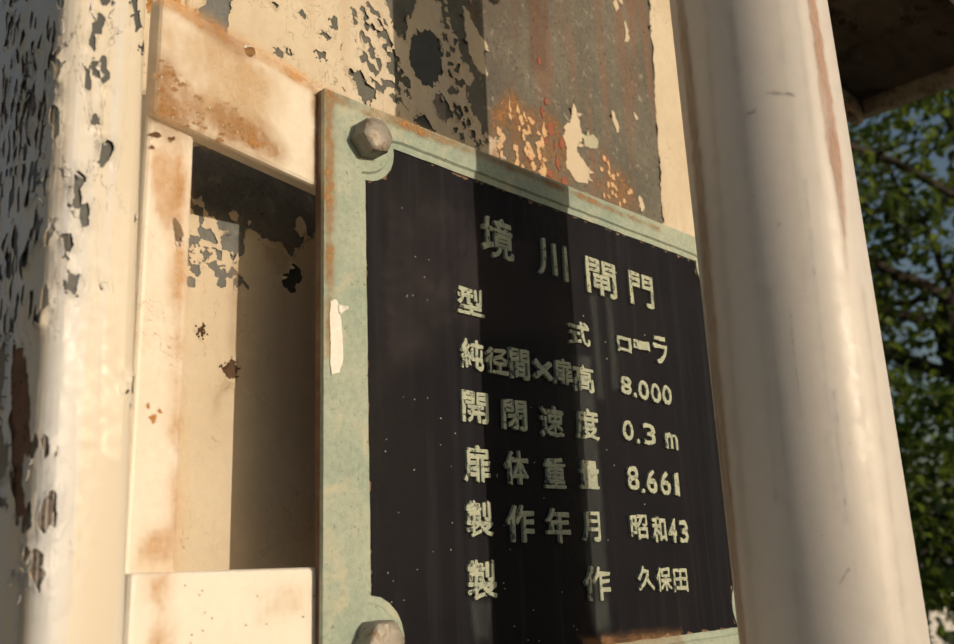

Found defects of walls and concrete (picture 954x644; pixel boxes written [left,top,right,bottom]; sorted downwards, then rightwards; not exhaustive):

peeling [0,0,80,482]
spalling [63,164,90,227]
spalling [84,0,115,91]
peeling [97,140,114,168]
corrosion [148,131,175,149]
peeling [173,95,316,293]
corrosion [215,106,280,156]
corrosion [285,66,306,82]
corrosion [394,117,452,143]
peeling [343,0,664,224]
corrosion [492,95,567,190]
corrosion [809,0,866,212]